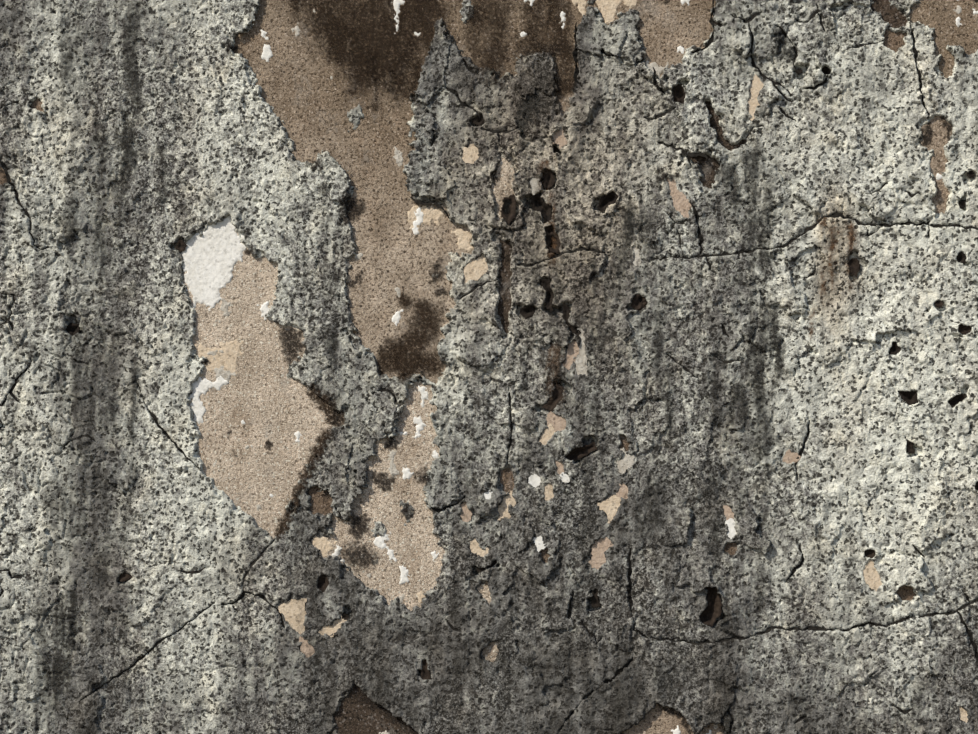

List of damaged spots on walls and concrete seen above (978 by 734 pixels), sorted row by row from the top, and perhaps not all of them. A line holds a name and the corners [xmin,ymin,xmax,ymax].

leakage [292,0,446,100]
leakage [466,0,575,96]
flaking render [870,0,978,78]
crack [655,204,978,274]
crack [858,182,917,198]
flaking render [921,115,953,214]
leakage [377,293,444,383]
flaking render [176,0,720,611]
crack [138,384,201,471]
crack [81,539,285,700]
crack [627,545,978,661]
flaking render [329,618,738,734]